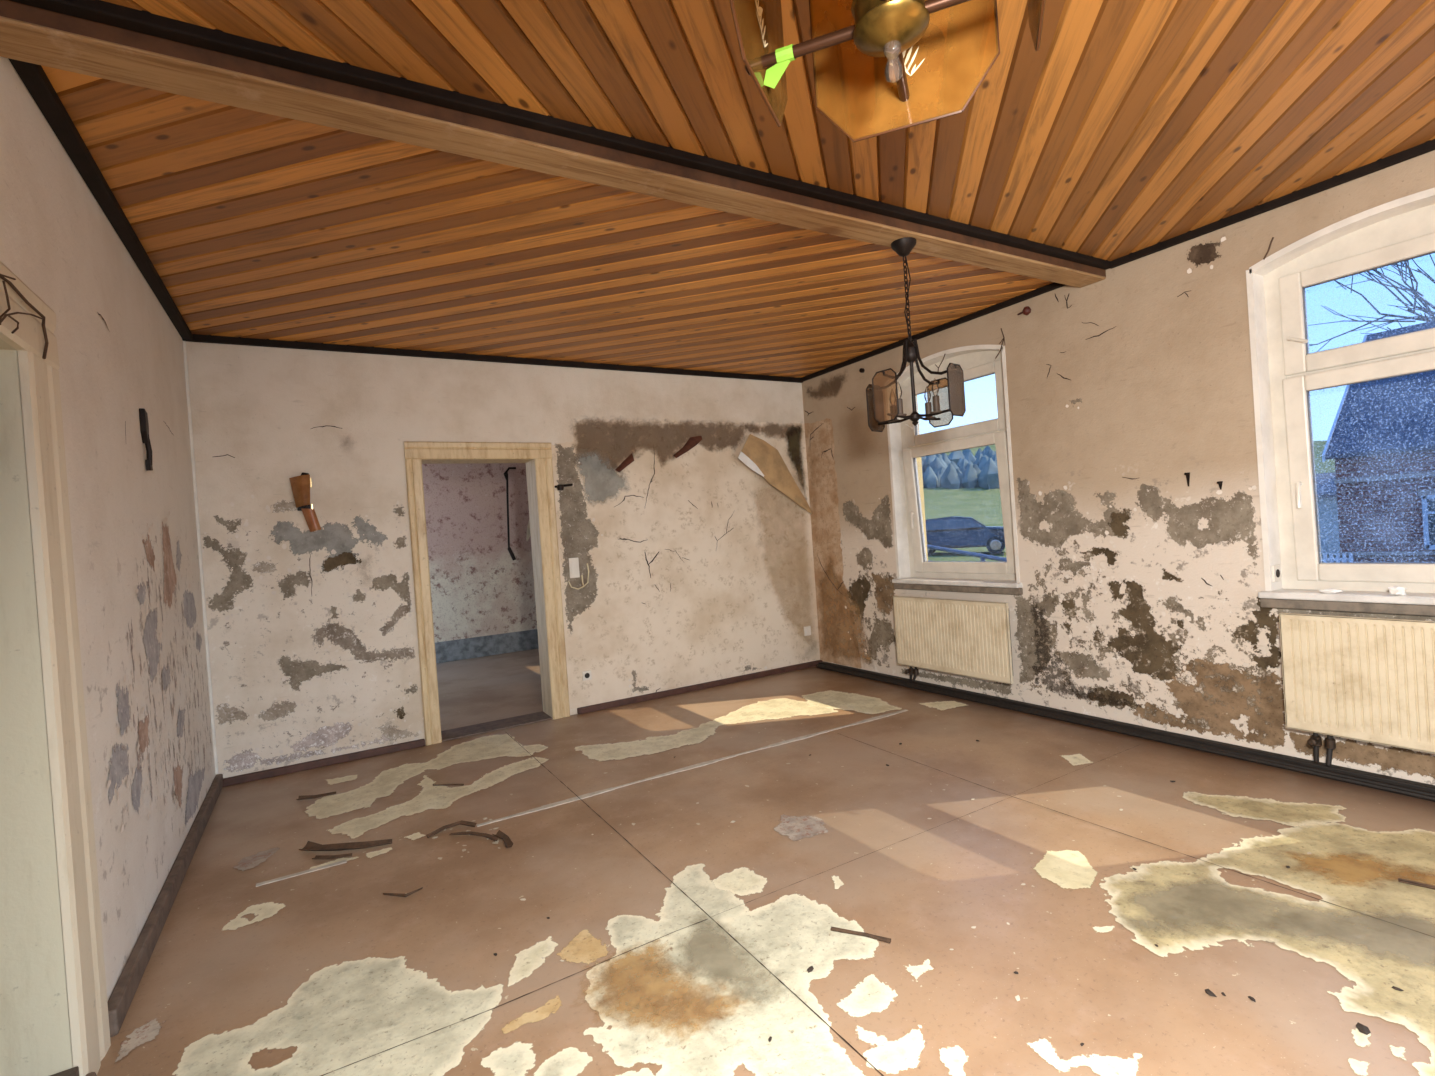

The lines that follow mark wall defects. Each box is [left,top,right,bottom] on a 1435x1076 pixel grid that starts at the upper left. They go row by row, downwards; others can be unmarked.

peeling [1186,237,1226,274]
leakage [808,376,844,398]
peeling [552,442,603,632]
peeling [107,495,424,835]
peeling [843,477,1435,779]
peeling [575,690,902,761]
peeling [304,734,549,839]
peeling [310,832,425,869]
peeling [114,1018,171,1064]
peeling [172,863,969,1076]
corrosion [594,947,739,1031]
peeling [1027,791,1435,1076]